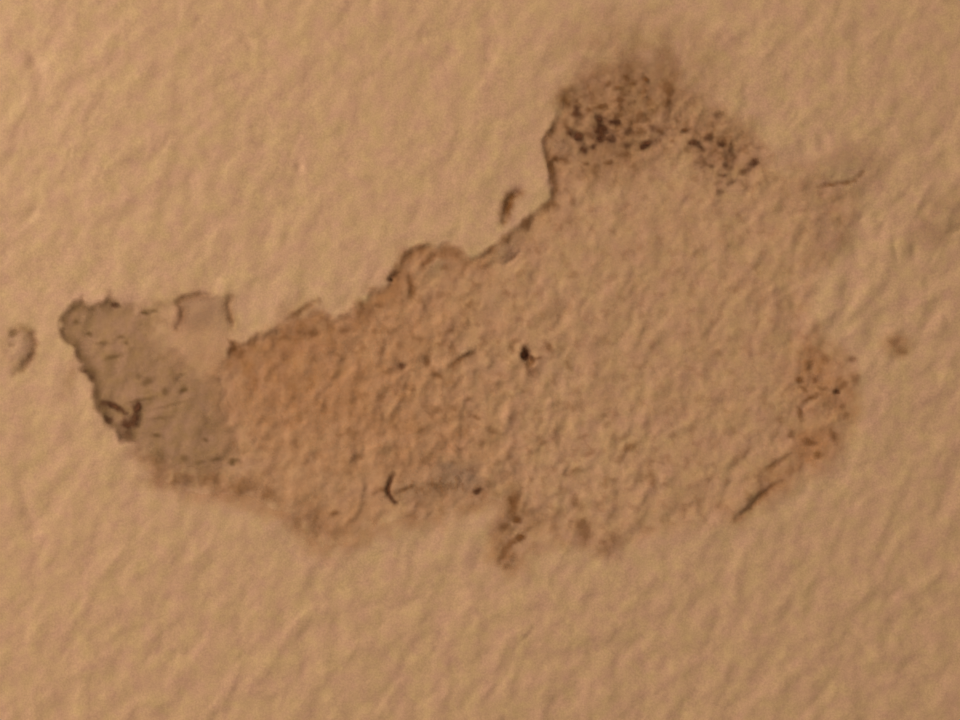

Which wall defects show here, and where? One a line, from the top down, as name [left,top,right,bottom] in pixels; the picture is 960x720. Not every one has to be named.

leakage [567,106,627,153]
spalling [503,193,515,222]
spalling [62,300,233,471]